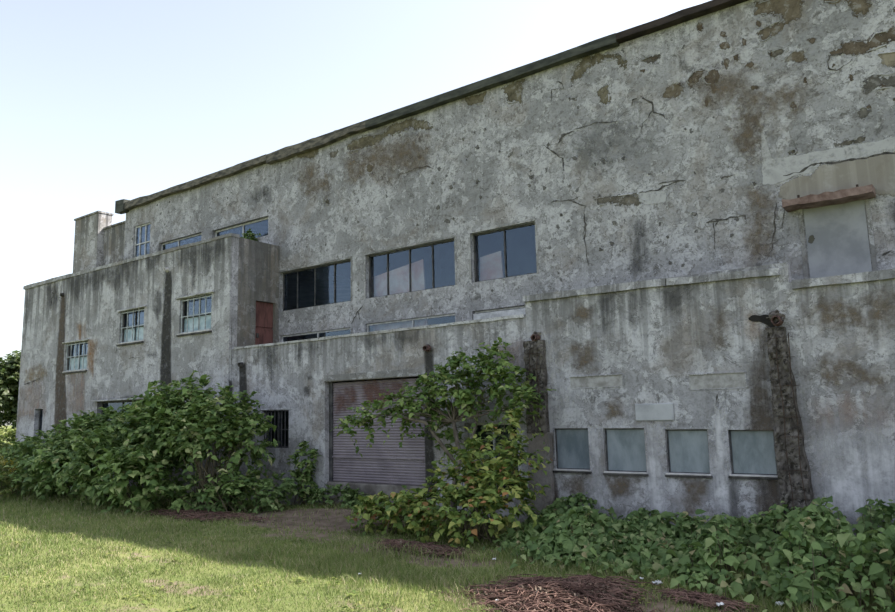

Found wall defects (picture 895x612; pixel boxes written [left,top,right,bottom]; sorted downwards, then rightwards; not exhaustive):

spalling [823,0,873,18]
spalling [570,52,628,83]
spalling [826,26,895,120]
crack [544,96,665,170]
crack [552,197,589,265]
spalling [593,192,645,207]
crack [706,215,746,249]
damp [23,248,160,433]
damp [155,272,172,393]
damp [686,410,736,513]
damp [747,327,780,522]
damp [822,434,895,518]